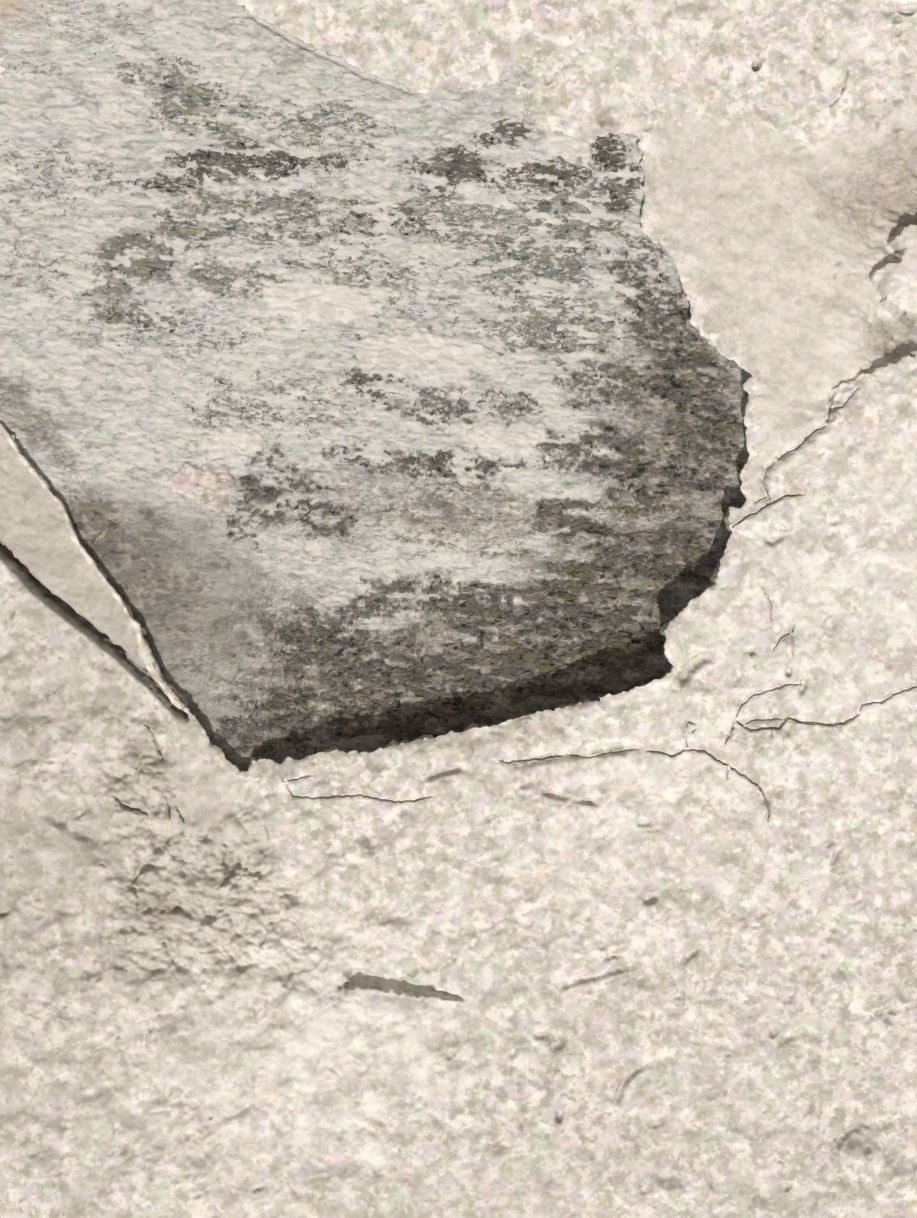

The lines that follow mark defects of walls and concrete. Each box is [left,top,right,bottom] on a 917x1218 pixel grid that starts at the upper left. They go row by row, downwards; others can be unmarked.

leakage [0,1,746,759]
spalling [0,0,917,772]
crack [730,386,860,529]
crack [498,584,917,827]
spalling [37,803,105,849]
spalling [74,717,316,990]
spalling [421,761,465,783]
spalling [540,784,599,809]
spalling [641,890,660,909]
spalling [0,914,22,985]
spalling [554,955,635,996]
spalling [676,940,704,962]